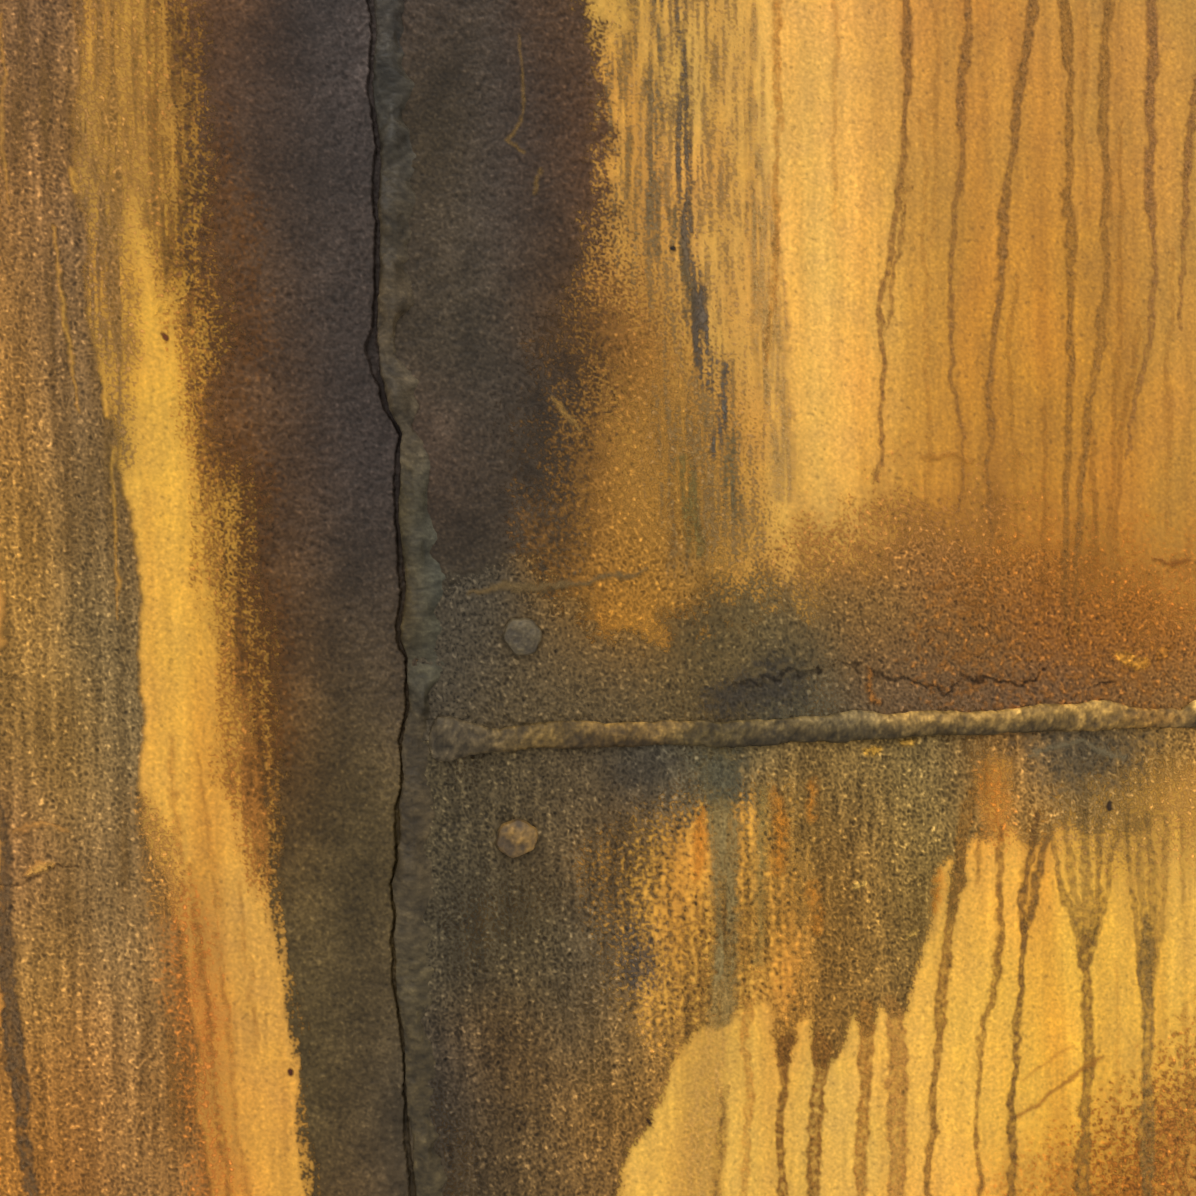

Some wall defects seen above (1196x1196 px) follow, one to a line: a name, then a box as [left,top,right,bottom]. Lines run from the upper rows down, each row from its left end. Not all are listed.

corrosion [0,0,416,1196]
corrosion [395,0,1196,1196]